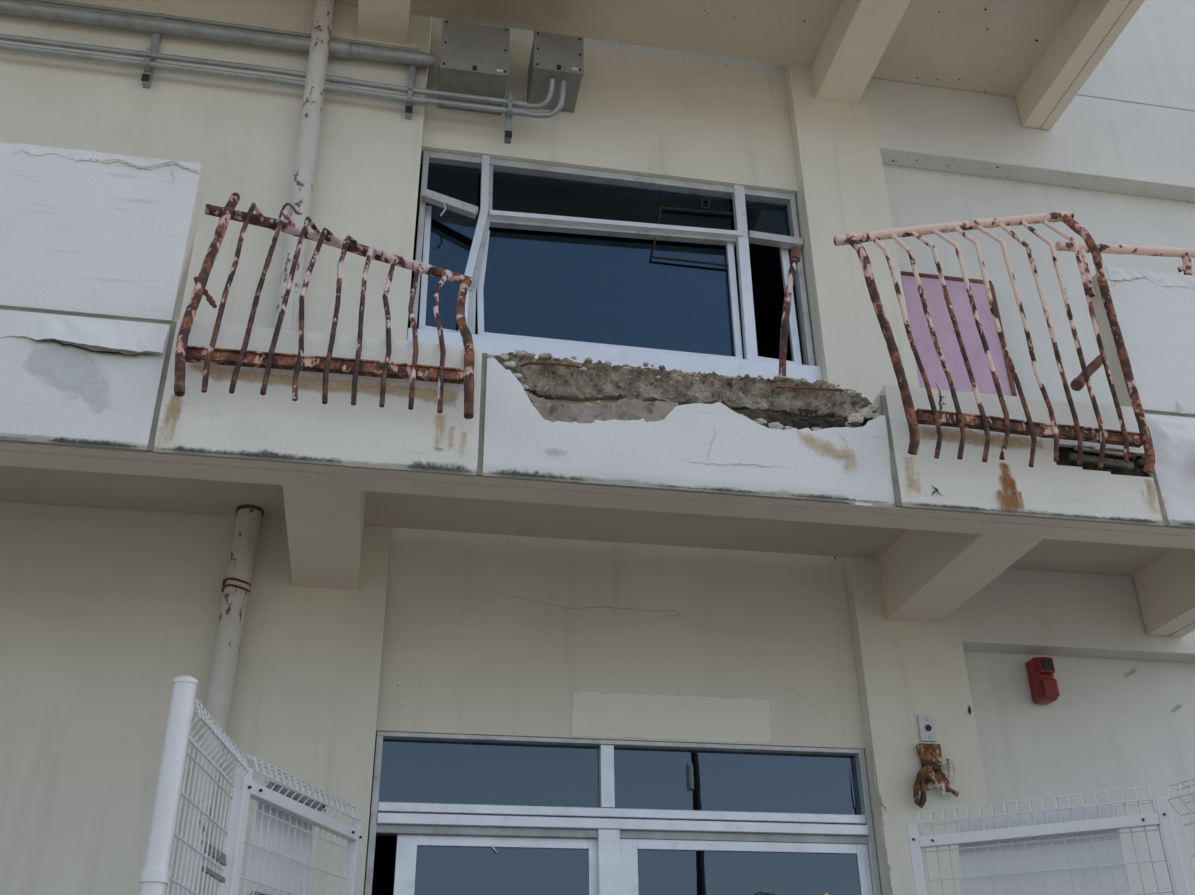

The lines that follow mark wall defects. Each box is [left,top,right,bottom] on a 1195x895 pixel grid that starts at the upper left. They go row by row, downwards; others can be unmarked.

peeling [12,143,201,174]
peeling [0,310,169,407]
rust [197,367,465,446]
spalling [494,350,881,431]
rust [998,463,1023,511]